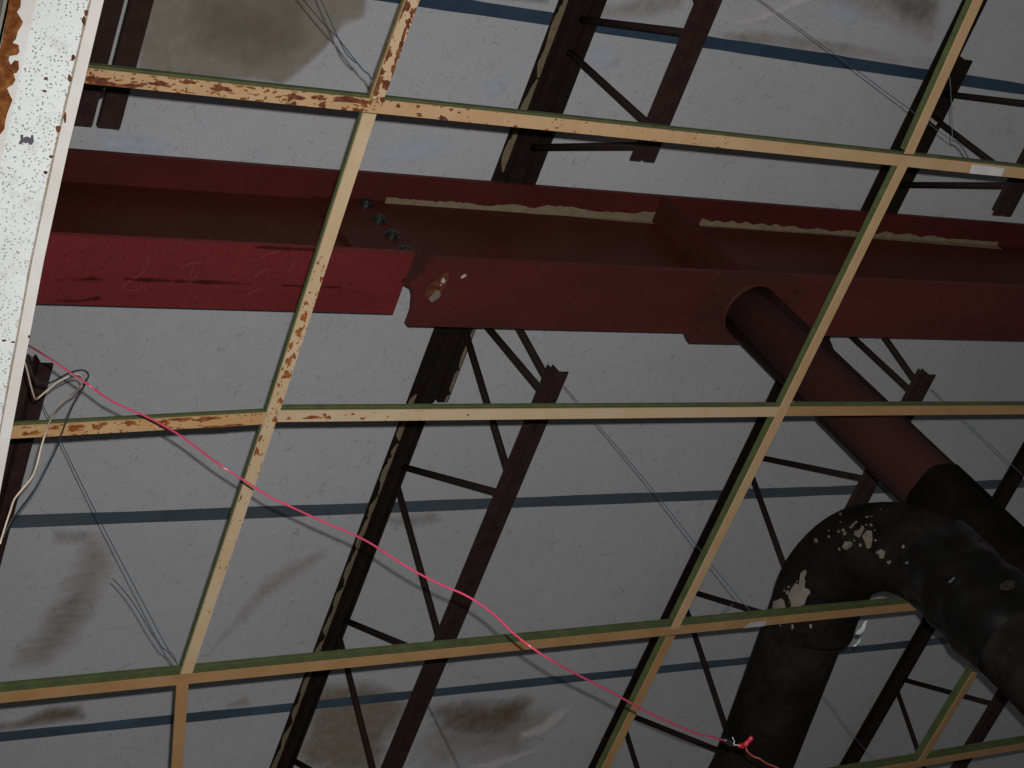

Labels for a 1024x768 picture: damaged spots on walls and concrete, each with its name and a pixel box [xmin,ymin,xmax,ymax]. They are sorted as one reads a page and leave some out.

leakage [140,0,364,81]
corrosion [0,0,471,432]
peeling [385,197,655,224]
peeling [699,218,859,237]
peeling [872,231,1001,249]
corrosion [21,246,422,475]
peeling [315,421,406,652]
peeling [814,508,891,564]
peeling [772,570,810,609]
peeling [271,671,313,768]